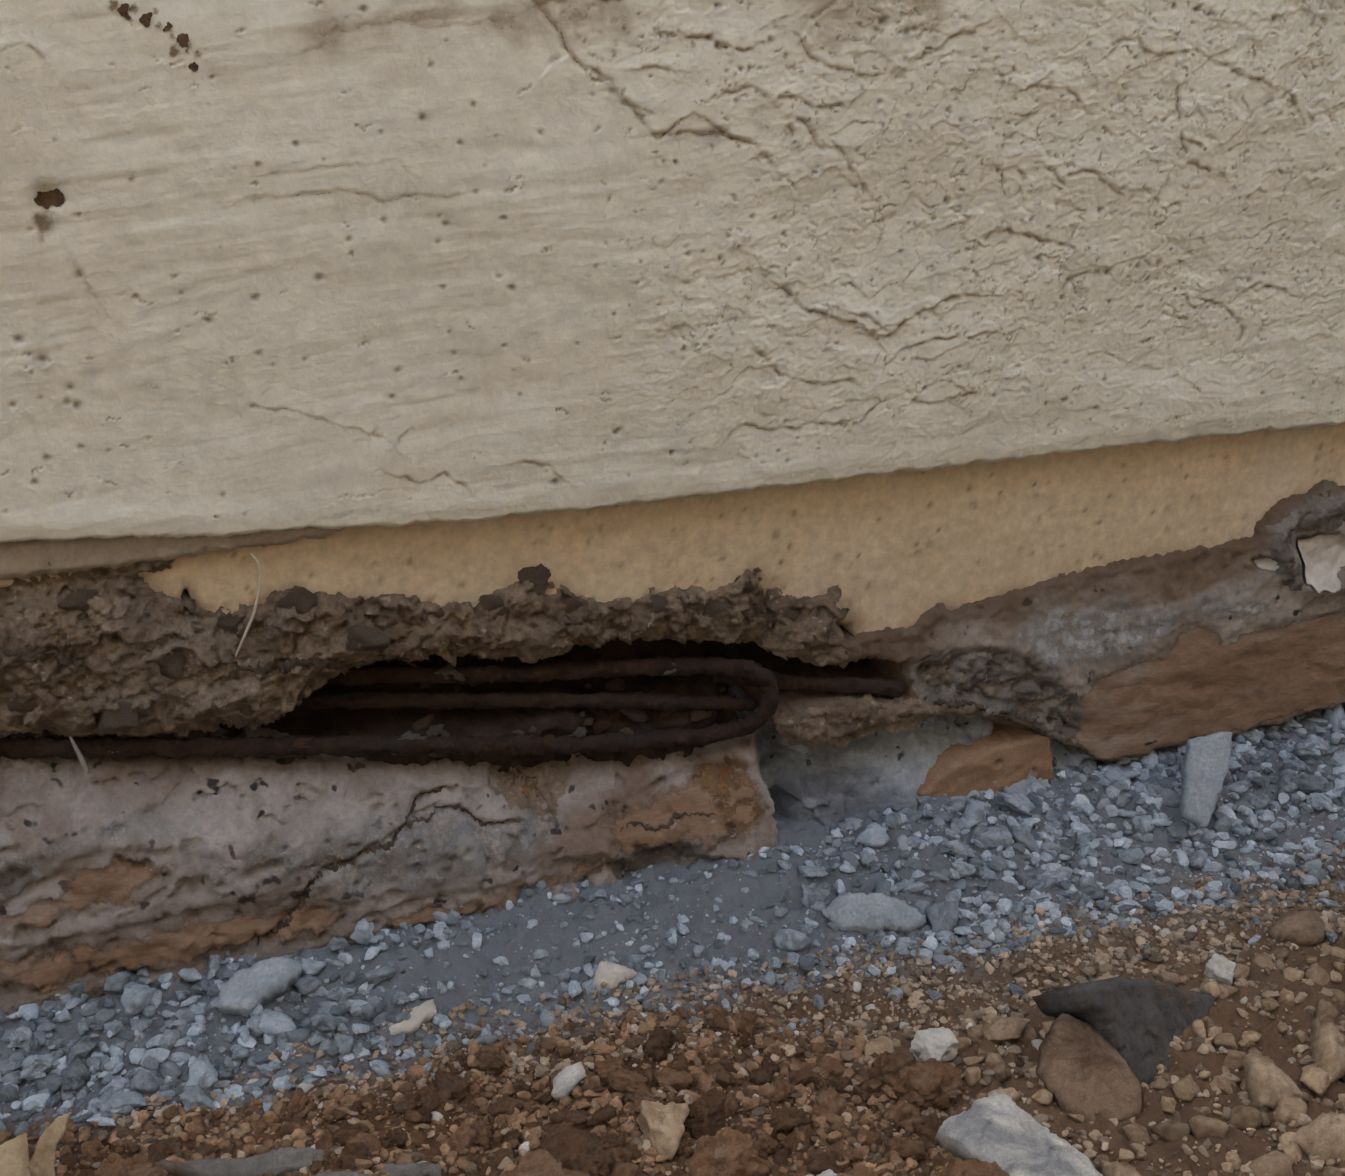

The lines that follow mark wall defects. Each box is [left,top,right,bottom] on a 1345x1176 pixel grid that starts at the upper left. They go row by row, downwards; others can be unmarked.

spalling [1255,494,1345,593]
spalling [0,559,850,737]
peeling [388,611,1345,929]
peeling [0,855,163,932]
peeling [0,896,342,994]
crack [257,786,521,946]